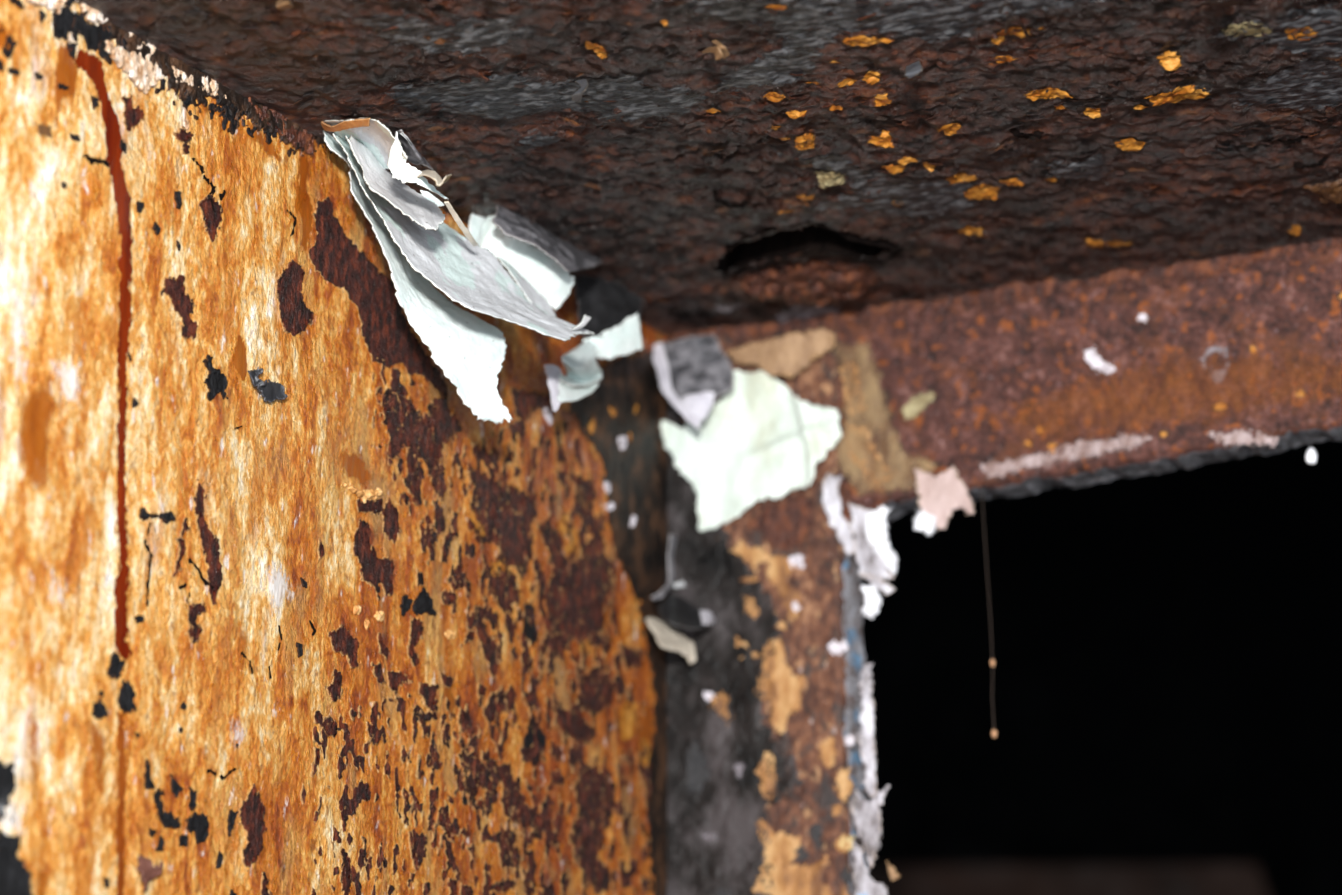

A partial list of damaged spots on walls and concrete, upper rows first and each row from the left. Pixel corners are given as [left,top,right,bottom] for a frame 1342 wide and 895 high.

corrosion [79,11,333,250]
corrosion [868,130,1024,200]
peeling [0,760,33,895]
corrosion [19,378,51,487]
corrosion [55,45,159,661]
spalling [139,478,223,644]
spalling [310,462,543,895]
corrosion [310,357,654,895]
peeling [275,117,898,619]
peeling [849,663,901,895]
peeling [913,466,975,535]
corrosion [670,225,1342,495]